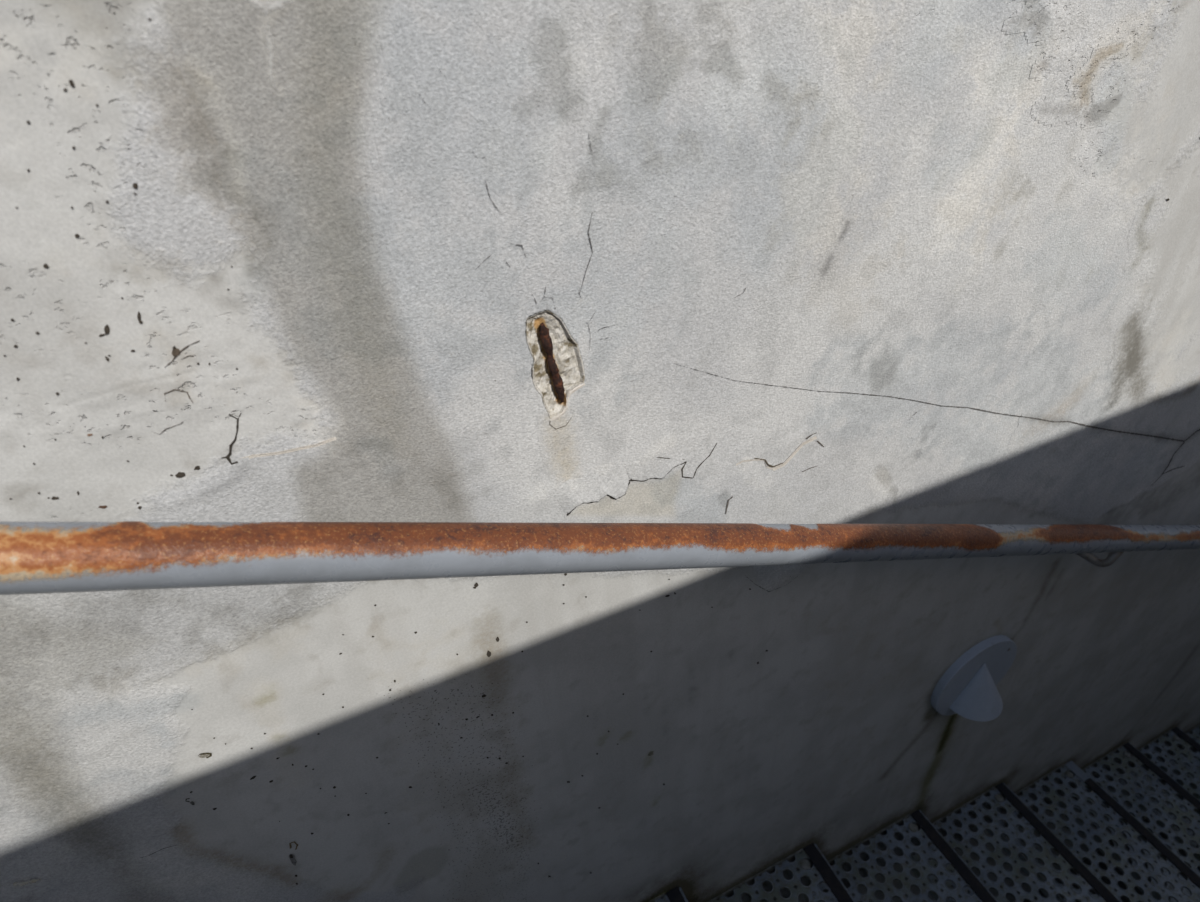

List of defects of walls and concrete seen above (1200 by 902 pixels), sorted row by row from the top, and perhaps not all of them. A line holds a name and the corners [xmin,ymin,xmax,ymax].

spalling [526,310,585,429]
crack [222,413,241,465]
peeling [553,435,717,523]
peeling [736,433,824,471]
crack [677,364,1200,486]
leakage [932,713,959,757]